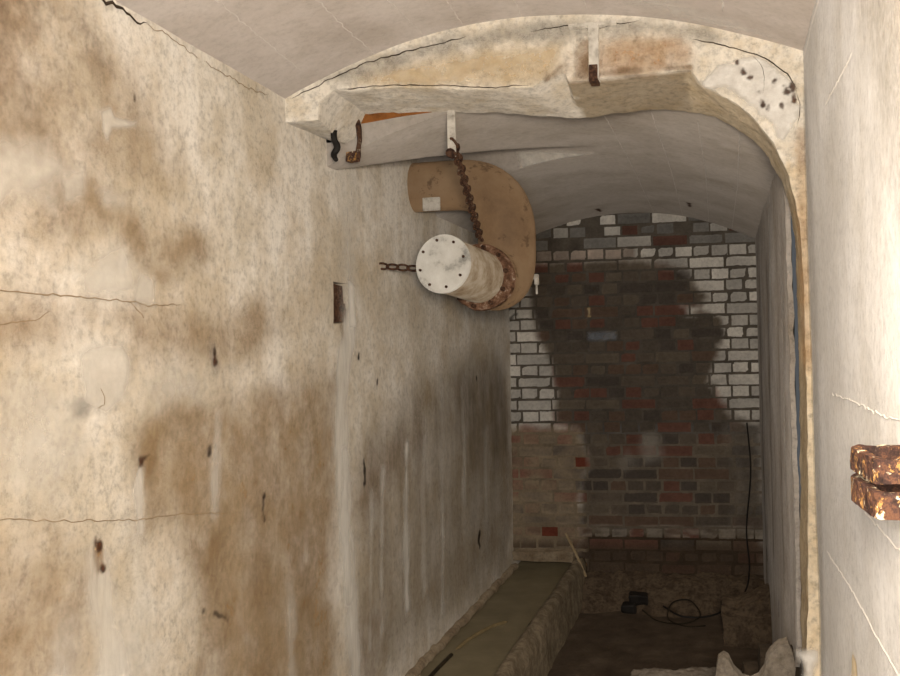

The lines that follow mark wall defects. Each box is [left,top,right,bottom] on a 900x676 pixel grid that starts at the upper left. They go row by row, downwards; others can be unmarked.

crack [102,0,267,95]
peeling [703,58,799,139]
crack [0,289,177,325]
corrosion [95,540,105,573]
crack [1,512,225,523]
water stain [226,283,359,676]